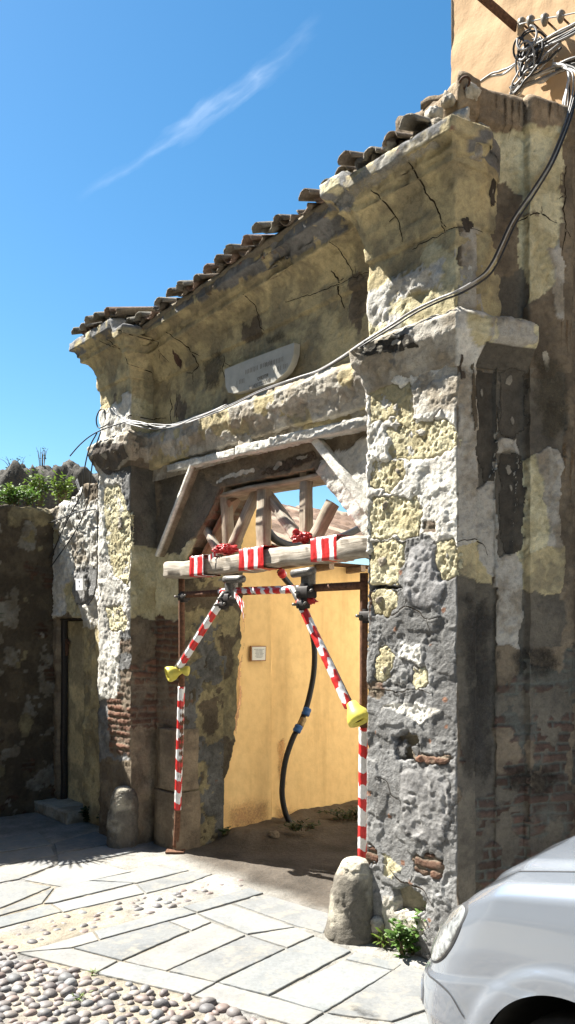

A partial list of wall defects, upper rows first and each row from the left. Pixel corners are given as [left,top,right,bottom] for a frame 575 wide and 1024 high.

crack [370,158,485,253]
crack [285,239,369,310]
peeling [364,333,419,356]
peeling [459,354,531,554]
spalling [92,443,135,586]
spalling [369,382,463,617]
spalling [106,605,128,632]
spalling [374,646,395,683]
spalling [412,665,429,690]